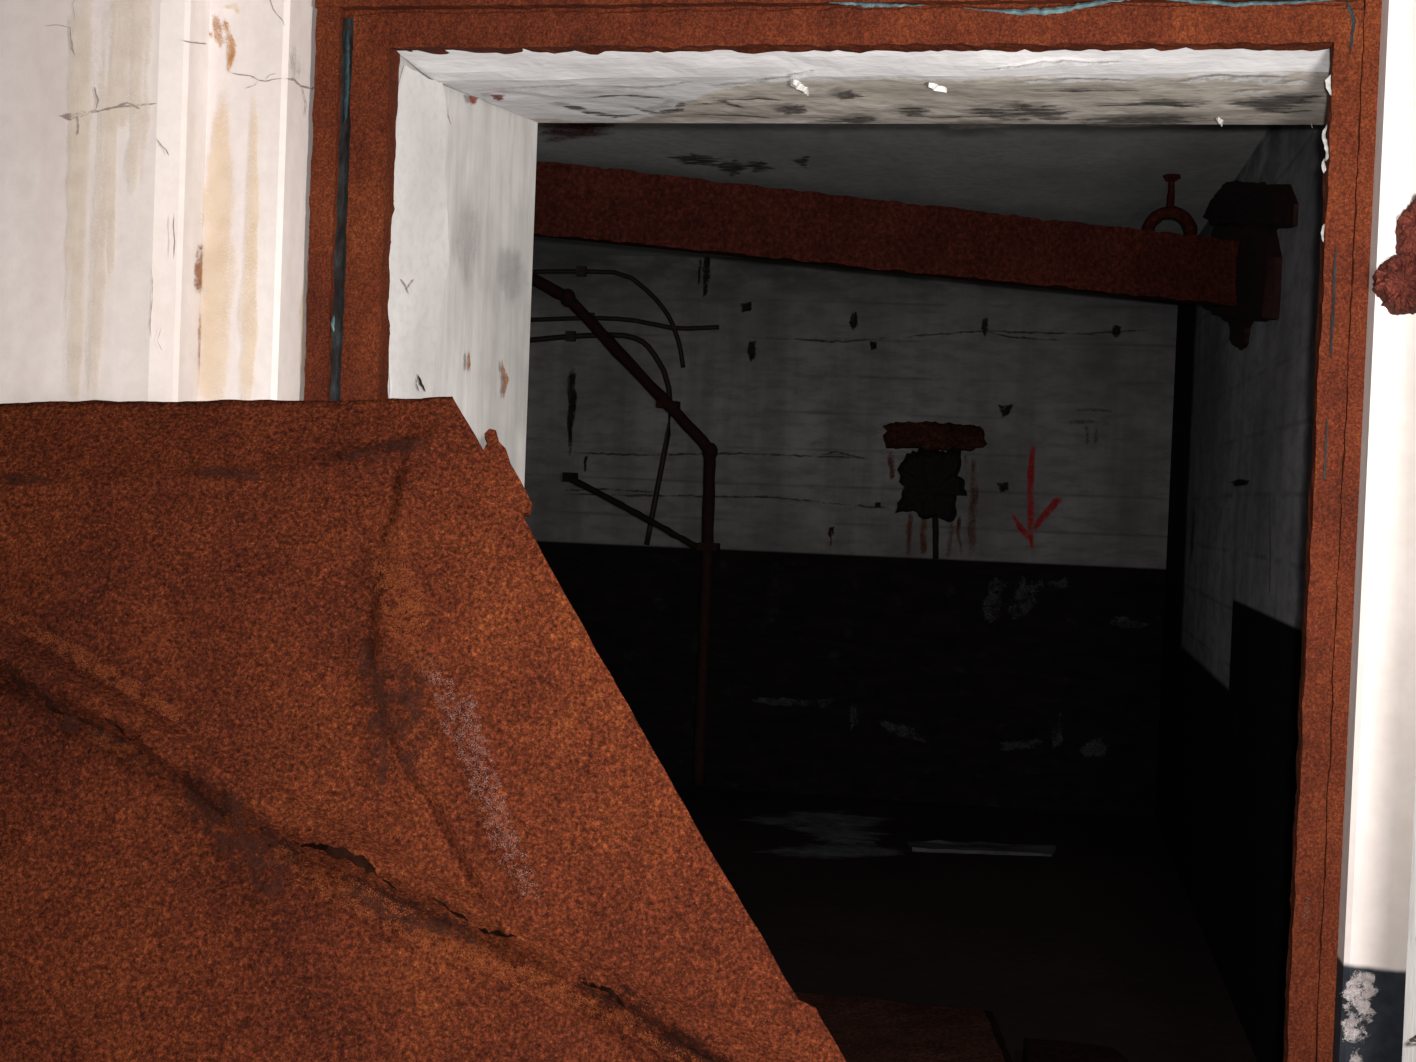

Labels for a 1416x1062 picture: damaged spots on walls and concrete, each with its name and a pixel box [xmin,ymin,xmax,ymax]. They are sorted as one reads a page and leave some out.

crack [48,1,76,55]
rust [209,3,240,73]
crack [61,87,169,155]
rust [194,89,261,401]
rust [0,606,206,740]
rust [261,844,702,1062]
peeling [1341,970,1379,1062]